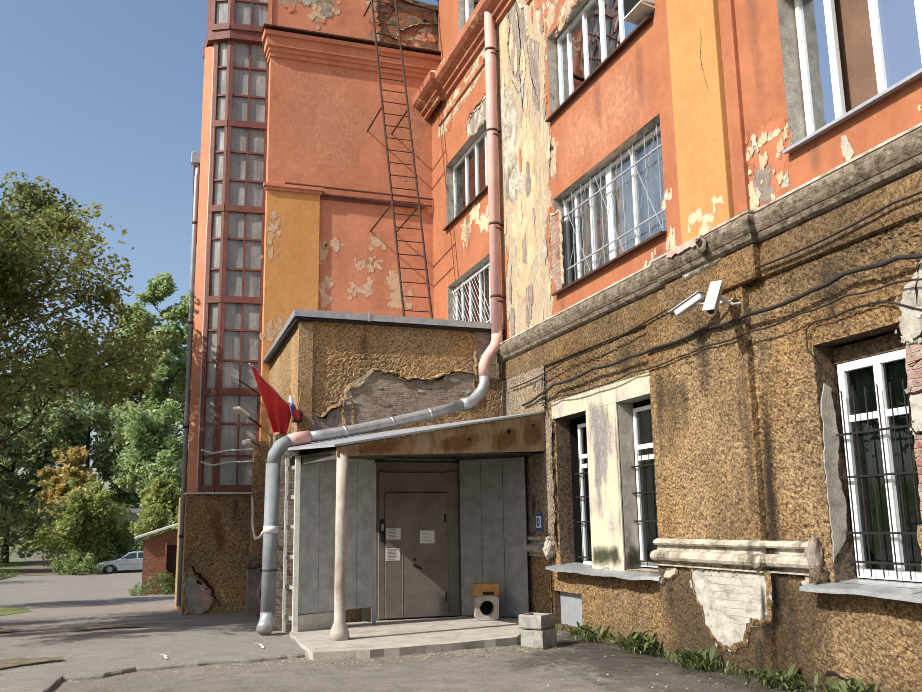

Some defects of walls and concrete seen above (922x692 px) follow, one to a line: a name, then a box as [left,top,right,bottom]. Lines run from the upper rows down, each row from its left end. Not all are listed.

peeling [438,0,578,338]
peeling [745,115,792,210]
peeling [687,195,724,234]
peeling [347,234,413,309]
flaking render [312,331,491,431]
flaking render [895,316,922,394]
peeling [501,376,556,550]
leakage [591,407,609,493]
flaking render [910,426,922,520]
crack [189,564,220,607]
mould [593,548,619,563]
spalling [689,564,773,653]